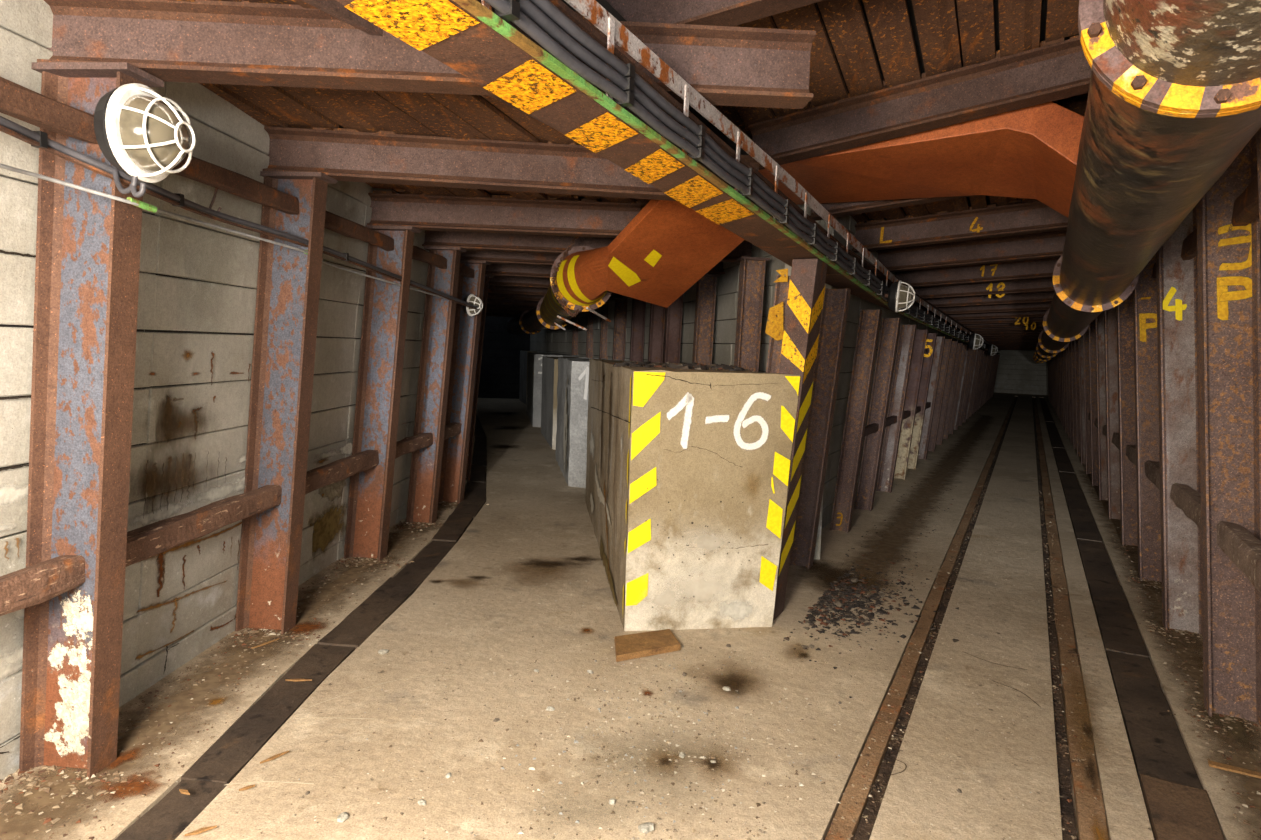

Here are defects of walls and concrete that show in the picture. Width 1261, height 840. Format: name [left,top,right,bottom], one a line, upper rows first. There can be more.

damp [135,396,246,524]
rust [135,522,242,660]
peeling [43,589,93,757]